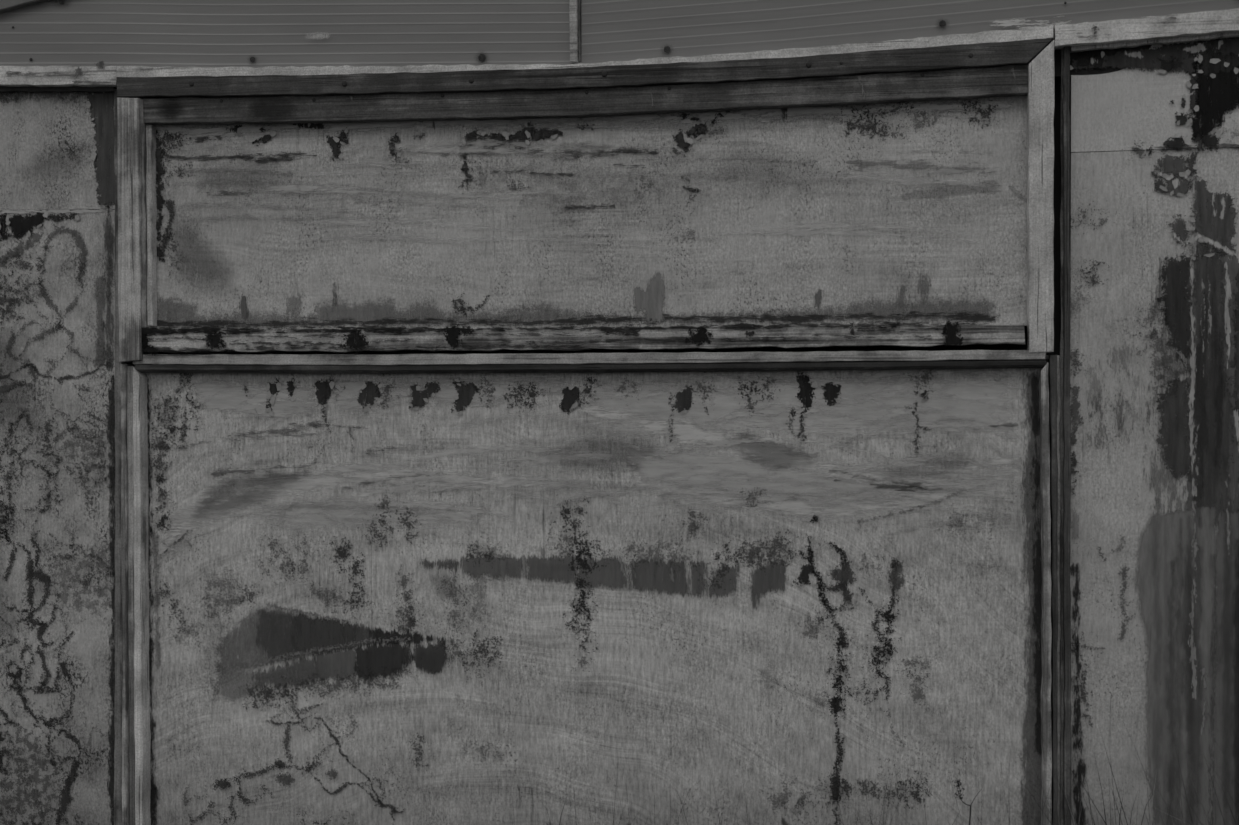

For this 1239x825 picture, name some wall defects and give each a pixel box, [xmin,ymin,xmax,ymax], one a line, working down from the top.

peeling [388,121,594,173]
peeling [672,111,730,157]
peeling [1149,40,1239,260]
peeling [0,209,80,241]
damp [1212,194,1226,219]
peeling [313,374,607,434]
peeling [668,372,718,442]
peeling [786,372,841,442]
crack [0,224,107,825]
damp [1136,212,1239,825]
damp [147,372,1087,825]
crack [182,691,404,825]